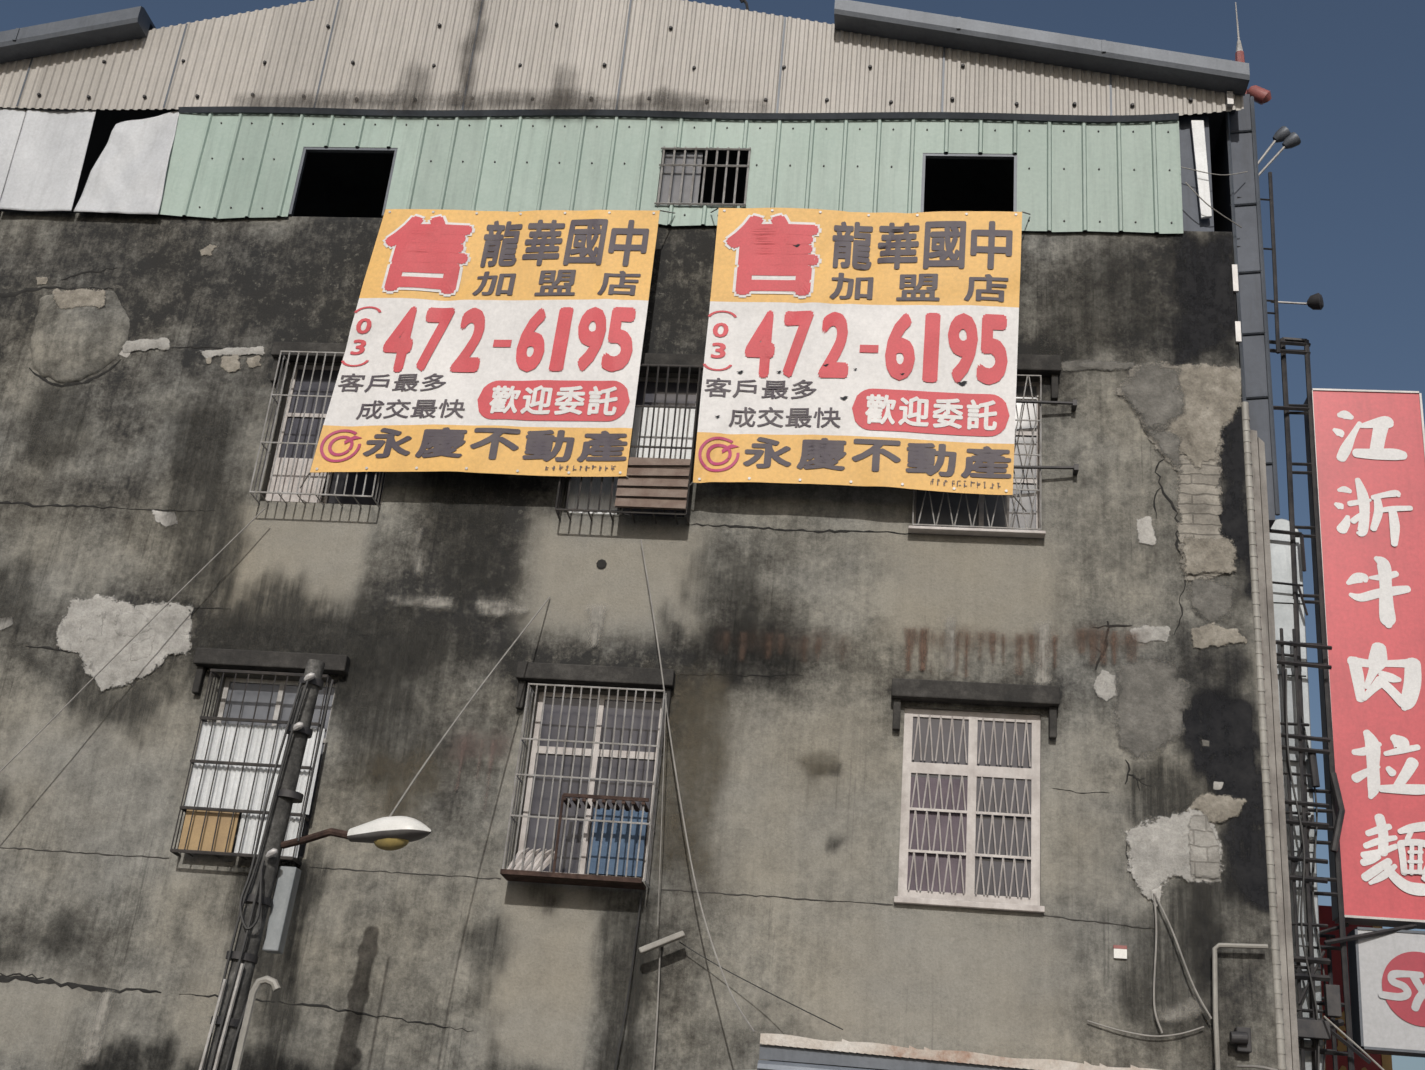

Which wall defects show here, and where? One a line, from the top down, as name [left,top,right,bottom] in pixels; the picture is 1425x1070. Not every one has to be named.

spalling [119,337,170,358]
spalling [200,346,265,373]
flaking render [1117,361,1248,649]
crack [1153,458,1187,635]
damp [0,561,30,624]
spalling [56,594,194,691]
damp [66,409,525,816]
rust [906,629,927,671]
rust [947,633,1057,676]
spalling [1093,670,1117,702]
spalling [1125,781,1247,907]
crack [0,973,474,1032]